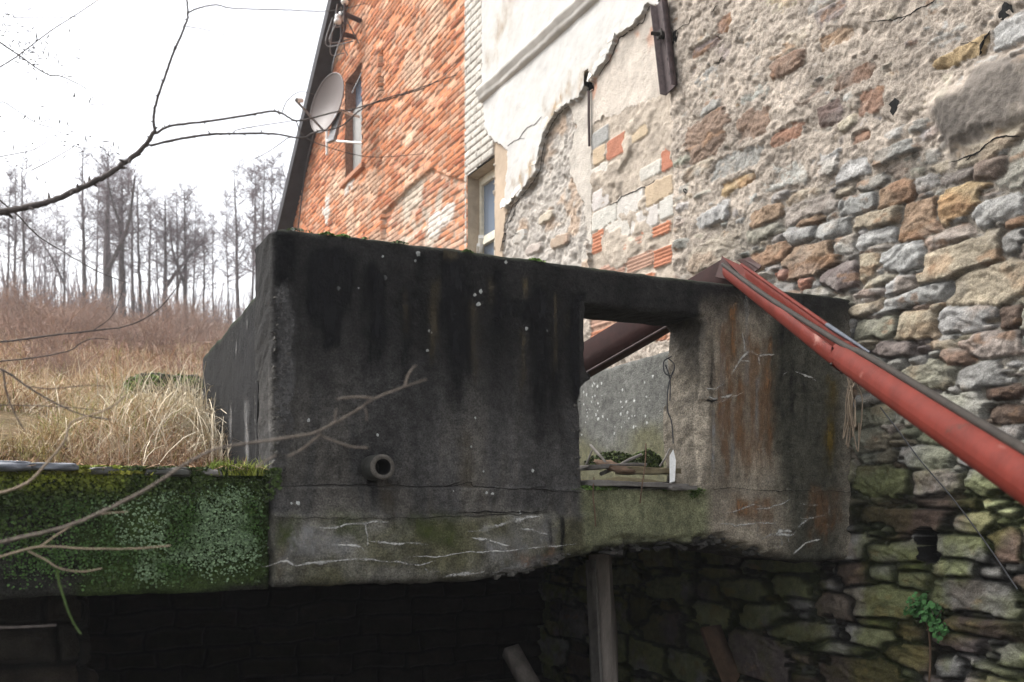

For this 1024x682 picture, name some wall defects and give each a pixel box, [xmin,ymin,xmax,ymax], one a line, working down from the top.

peeling [587,0,661,124]
crack [869,0,935,23]
peeling [500,102,589,268]
crack [952,135,1019,162]
damp [306,247,387,359]
damp [568,292,585,401]
crack [706,333,813,462]
crack [265,482,581,577]
crack [710,487,848,553]